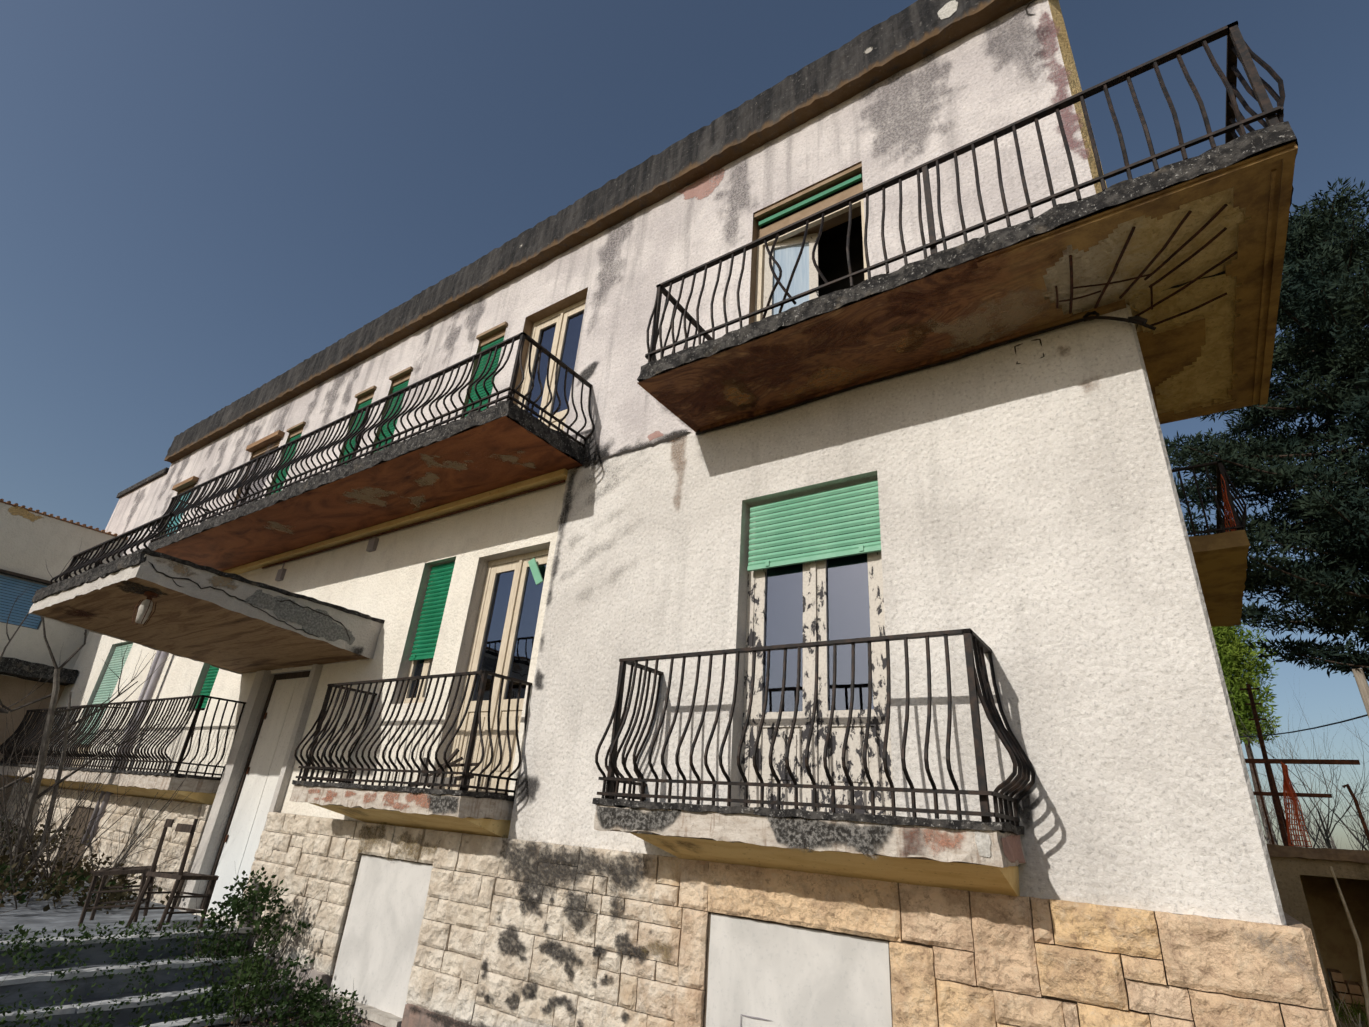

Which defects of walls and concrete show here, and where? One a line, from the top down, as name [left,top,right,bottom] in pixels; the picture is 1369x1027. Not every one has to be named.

water stain [989,2,1044,76]
water stain [863,54,949,154]
spalling [1043,187,1251,414]
water stain [572,433,608,467]
crack [148,561,350,640]
water stain [477,836,671,1027]
water stain [411,1006,486,1027]